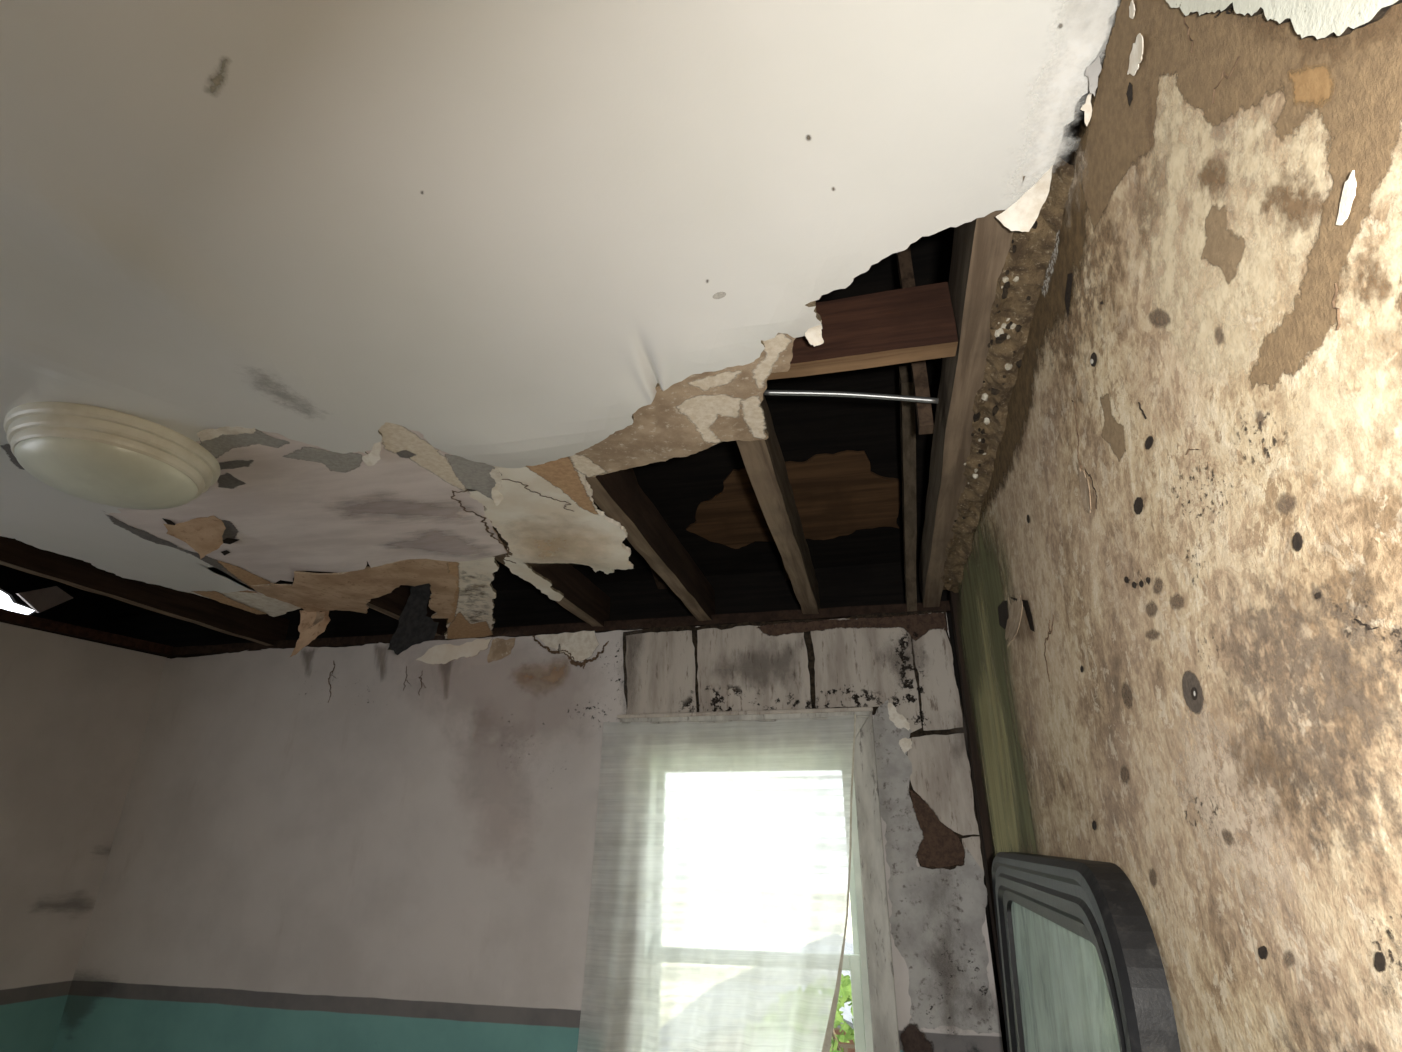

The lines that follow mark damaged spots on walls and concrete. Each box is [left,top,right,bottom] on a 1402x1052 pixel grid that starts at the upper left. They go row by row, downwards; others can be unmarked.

flaking render [941,0,1402,593]
peeling [805,320,824,346]
flaking render [998,594,1035,646]
water stain [1230,584,1402,855]
peeling [623,610,1000,1034]
spalling [1258,946,1268,959]
spalling [1375,952,1386,972]
water stain [900,1024,934,1052]